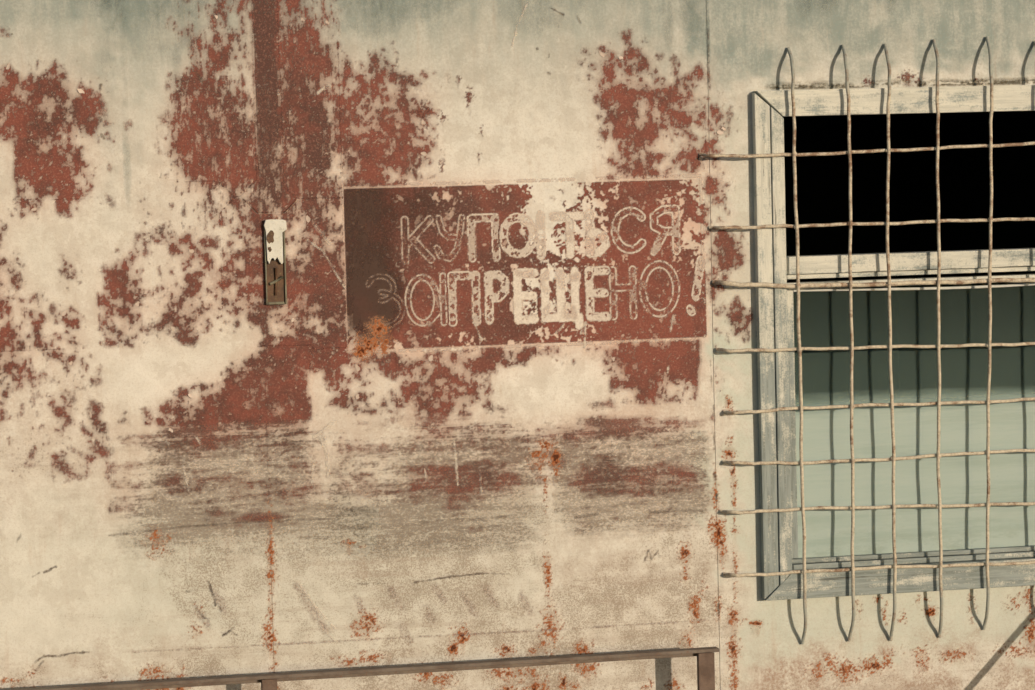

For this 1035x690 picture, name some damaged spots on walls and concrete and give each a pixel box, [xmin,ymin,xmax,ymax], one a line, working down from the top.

peeling [0,61,115,218]
peeling [582,30,753,342]
peeling [98,0,709,553]
peeling [0,258,100,421]
peeling [48,387,114,479]
corrosion [529,439,562,507]
corrosion [350,612,378,640]
corrosion [447,627,470,661]
corrosion [487,641,600,690]
corrosion [529,556,563,654]
corrosion [708,436,762,690]
corrosion [812,649,893,682]